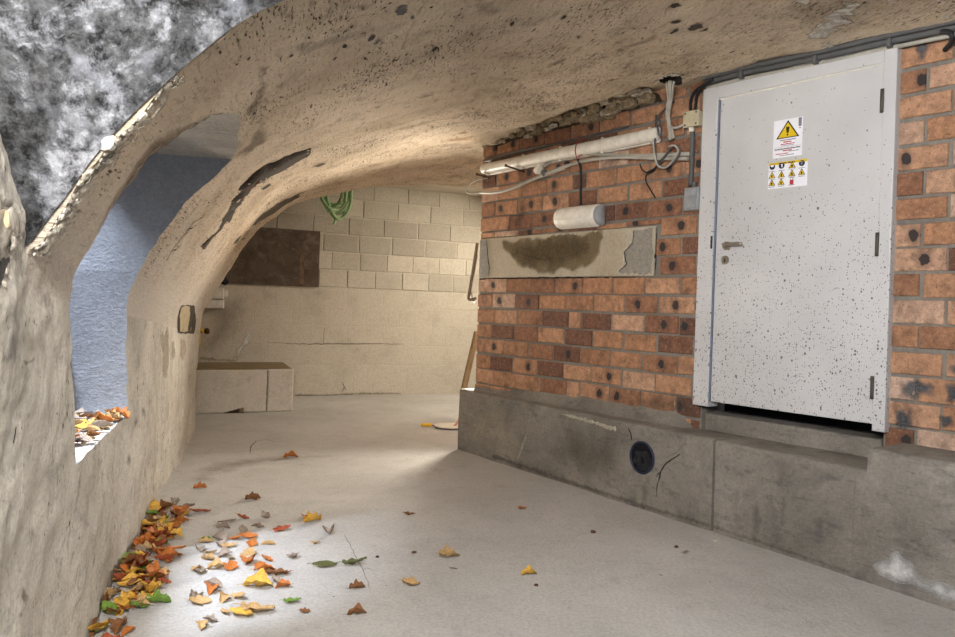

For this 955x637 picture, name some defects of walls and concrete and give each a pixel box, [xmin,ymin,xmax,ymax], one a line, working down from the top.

leakage [503,231,603,273]
peeling [618,228,656,277]
crack [656,434,687,497]
leakage [876,554,915,581]
leakage [932,584,955,599]